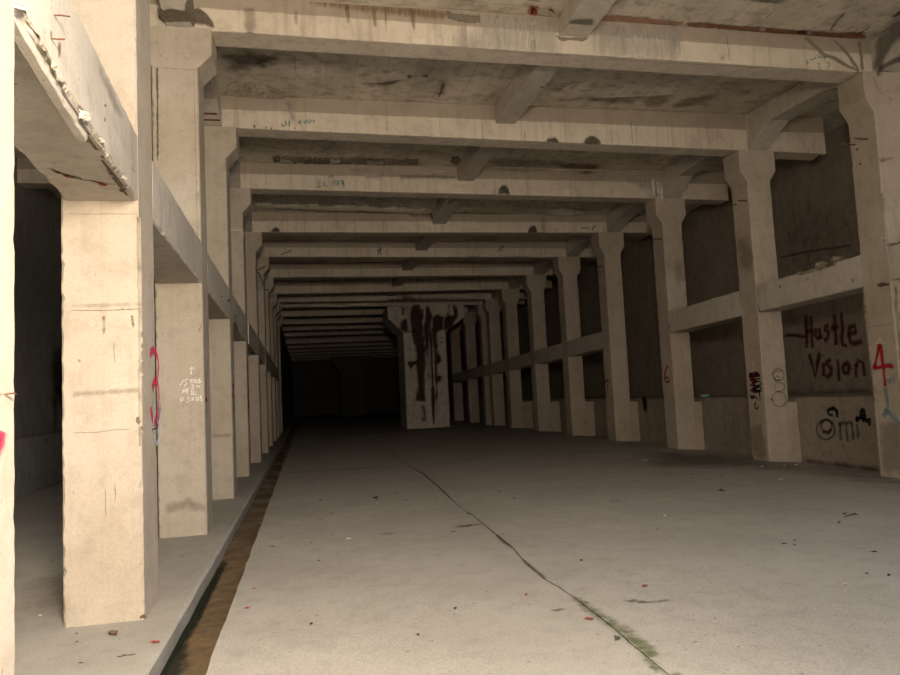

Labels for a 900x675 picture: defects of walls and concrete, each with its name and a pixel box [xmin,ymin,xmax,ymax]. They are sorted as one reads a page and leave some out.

spalling [13,0,134,195]
rust [602,15,866,39]
rust [400,305,458,424]
crack [305,428,669,675]